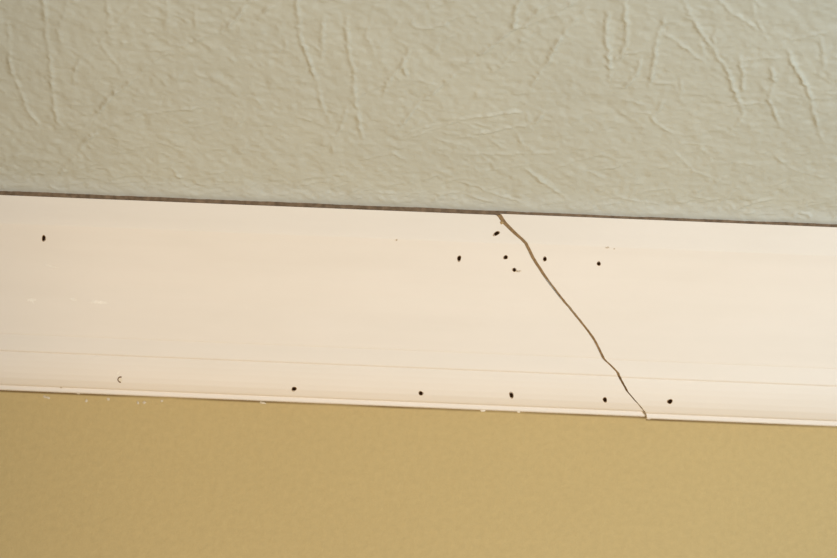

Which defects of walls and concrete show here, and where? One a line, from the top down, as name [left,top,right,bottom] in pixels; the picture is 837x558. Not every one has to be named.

crack [497,215,646,417]